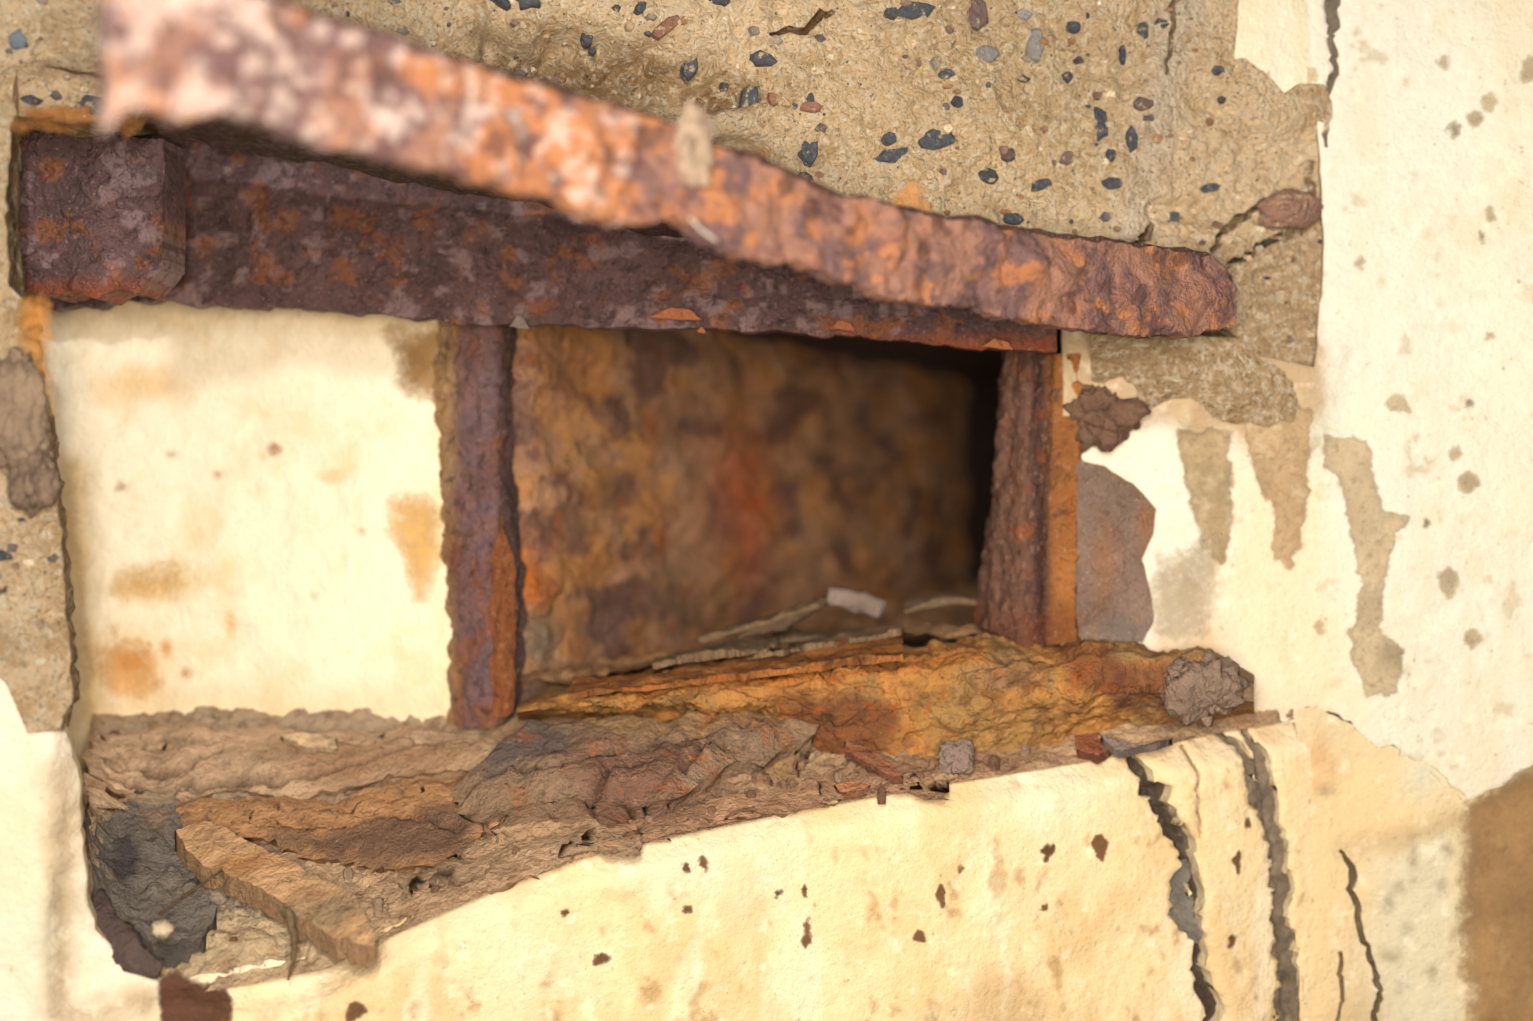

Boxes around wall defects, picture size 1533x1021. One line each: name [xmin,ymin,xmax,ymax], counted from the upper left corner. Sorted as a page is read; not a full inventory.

spalling [0,0,149,386]
rust [16,106,142,133]
rust [649,308,706,334]
spalling [293,0,1332,367]
rust [896,183,931,212]
rust [980,339,1013,350]
crack [1324,0,1340,94]
spalling [0,407,80,733]
peeling [1155,408,1429,697]
crack [1126,729,1299,1021]
crack [1335,849,1382,1021]
leakage [1461,768,1533,1021]